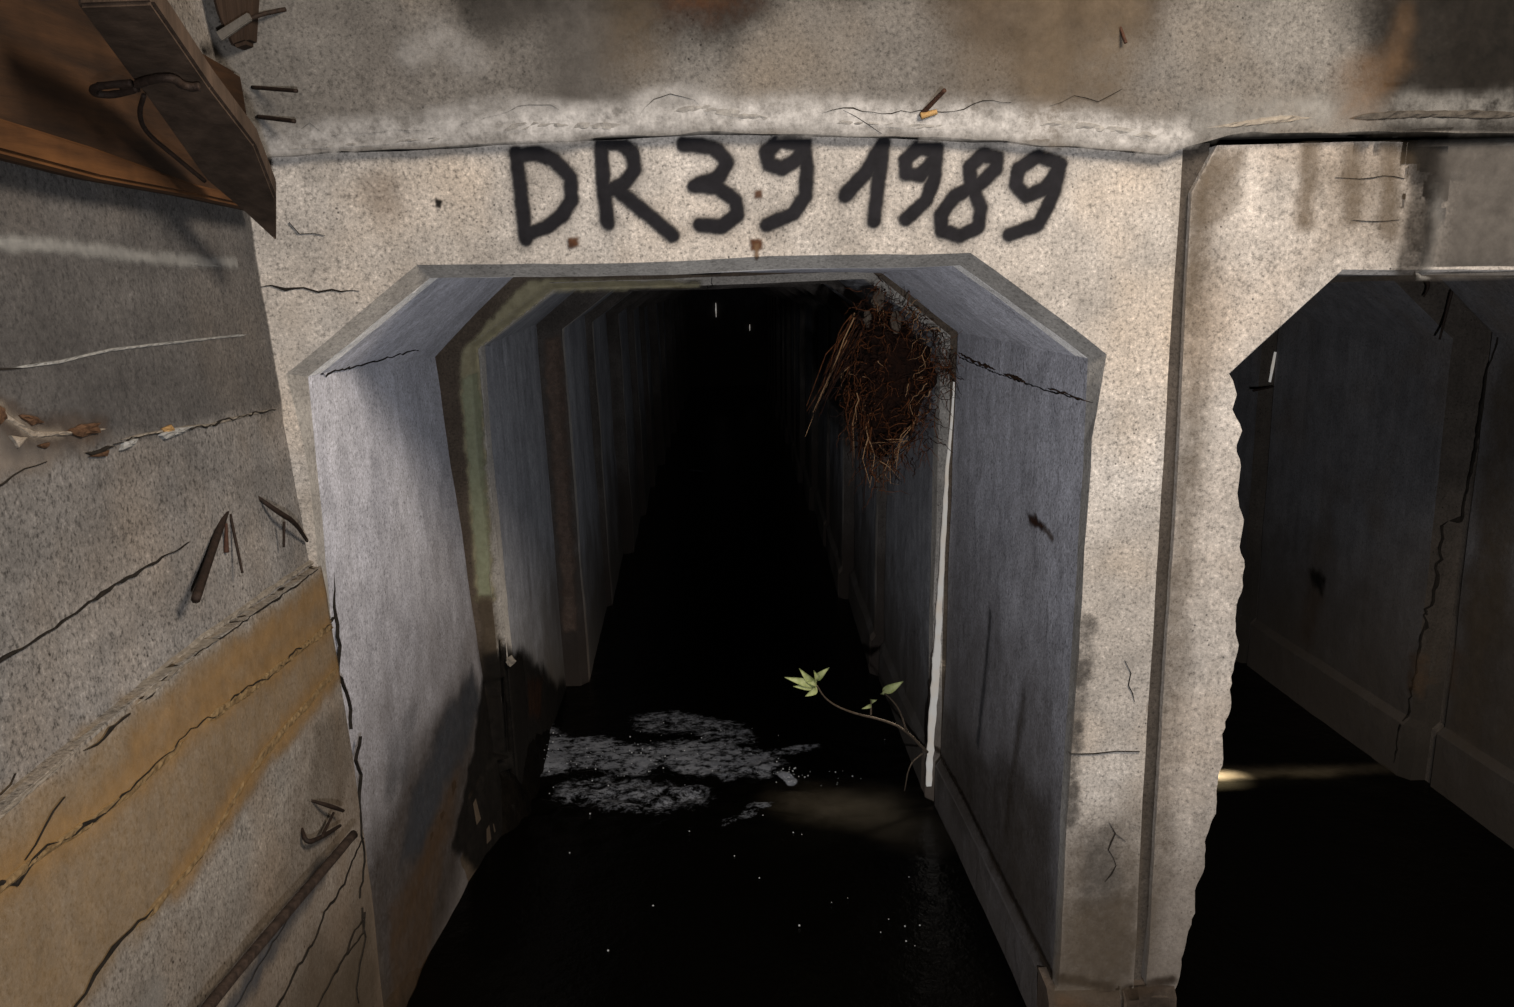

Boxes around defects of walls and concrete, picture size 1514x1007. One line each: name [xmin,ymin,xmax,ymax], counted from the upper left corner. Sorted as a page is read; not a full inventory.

crack [262,285,356,293]
crack [678,273,720,289]
crack [0,334,249,371]
spalling [0,403,138,486]
spalling [158,425,194,439]
crack [1394,337,1498,762]
crack [0,542,367,1007]